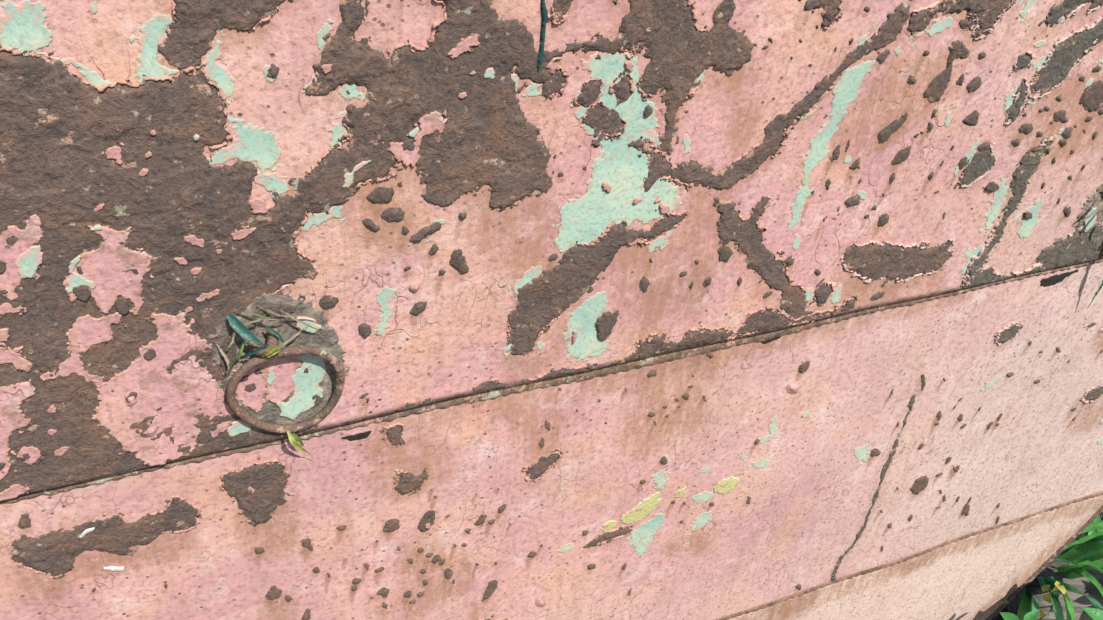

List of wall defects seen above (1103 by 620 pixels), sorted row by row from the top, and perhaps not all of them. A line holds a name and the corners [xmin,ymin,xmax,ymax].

spalling [361,181,467,255]
spalling [438,249,469,276]
corrosion [0,0,1035,501]
peeling [548,51,683,262]
peeling [786,40,991,250]
corrosion [837,112,1103,300]
corrosion [1000,0,1103,127]
spalling [1011,56,1103,164]
peeling [276,354,327,420]
peeling [563,290,620,363]
corrosion [1071,386,1103,426]
crack [831,374,926,581]